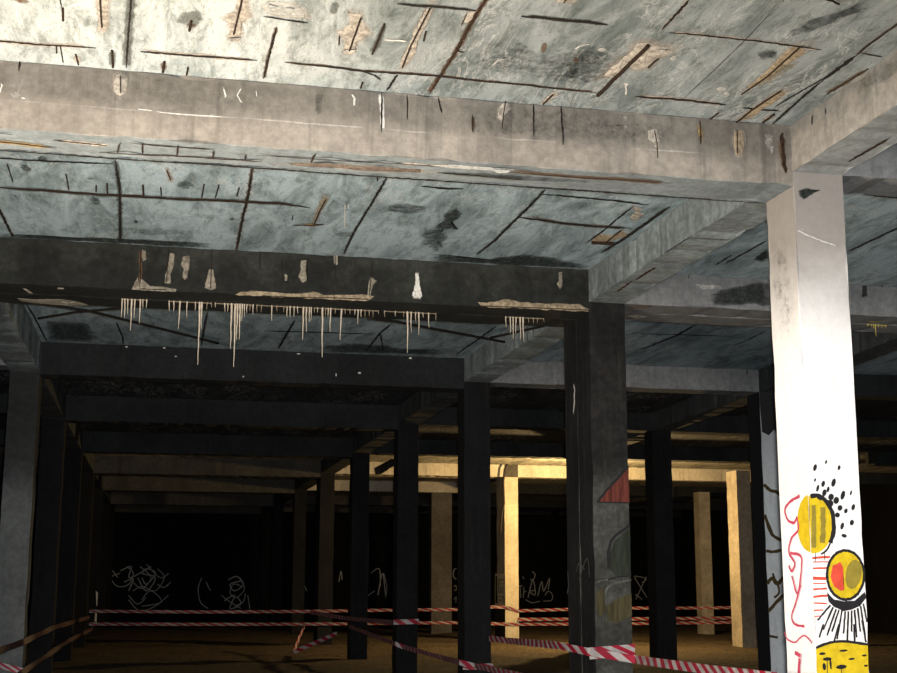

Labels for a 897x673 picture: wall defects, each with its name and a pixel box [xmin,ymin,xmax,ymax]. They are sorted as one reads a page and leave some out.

spalling [224,0,251,42]
peeling [261,2,304,18]
spalling [338,14,385,55]
spalling [596,42,677,97]
spalling [741,47,805,95]
spalling [235,259,376,301]
water stain [412,273,422,299]
spalling [478,299,589,312]
water stain [169,300,437,367]
water stain [505,316,544,340]